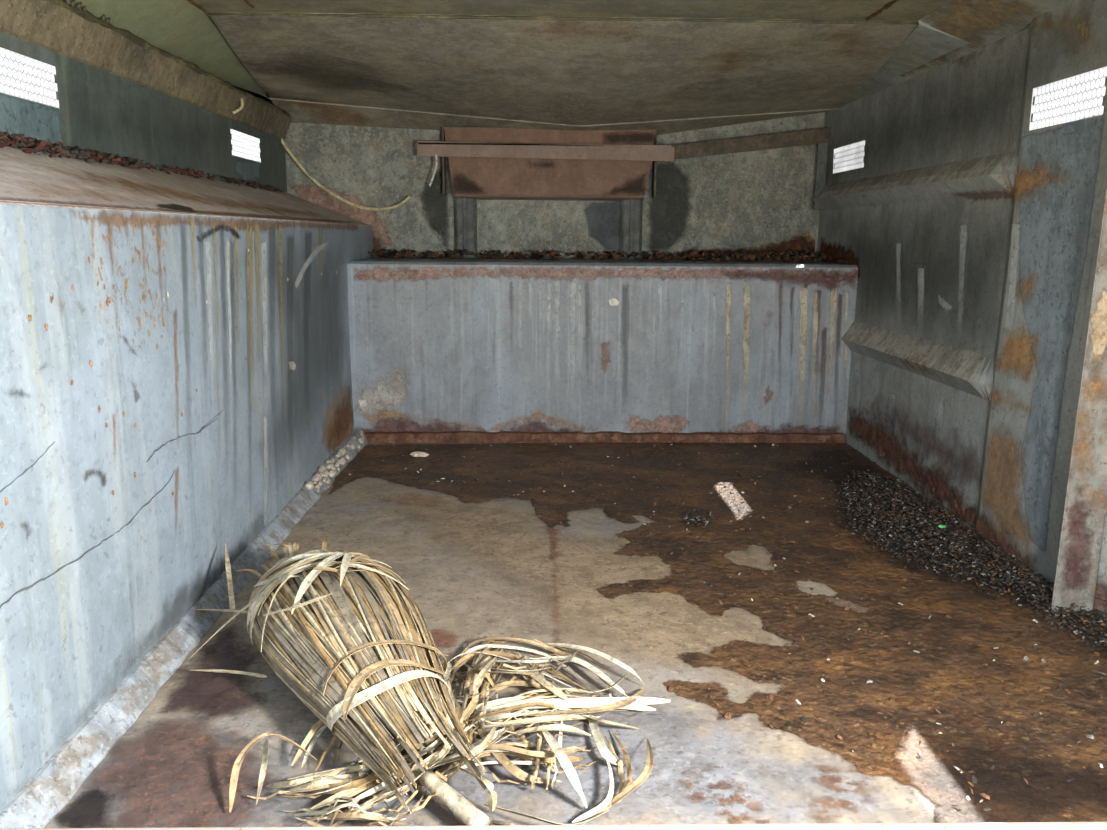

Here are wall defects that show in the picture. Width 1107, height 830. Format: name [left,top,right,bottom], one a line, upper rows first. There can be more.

corrosion [0,179,860,360]
corrosion [997,335,1035,379]
corrosion [1090,291,1107,364]
crack [147,410,223,462]
crack [0,472,174,608]
corrosion [324,398,1107,823]